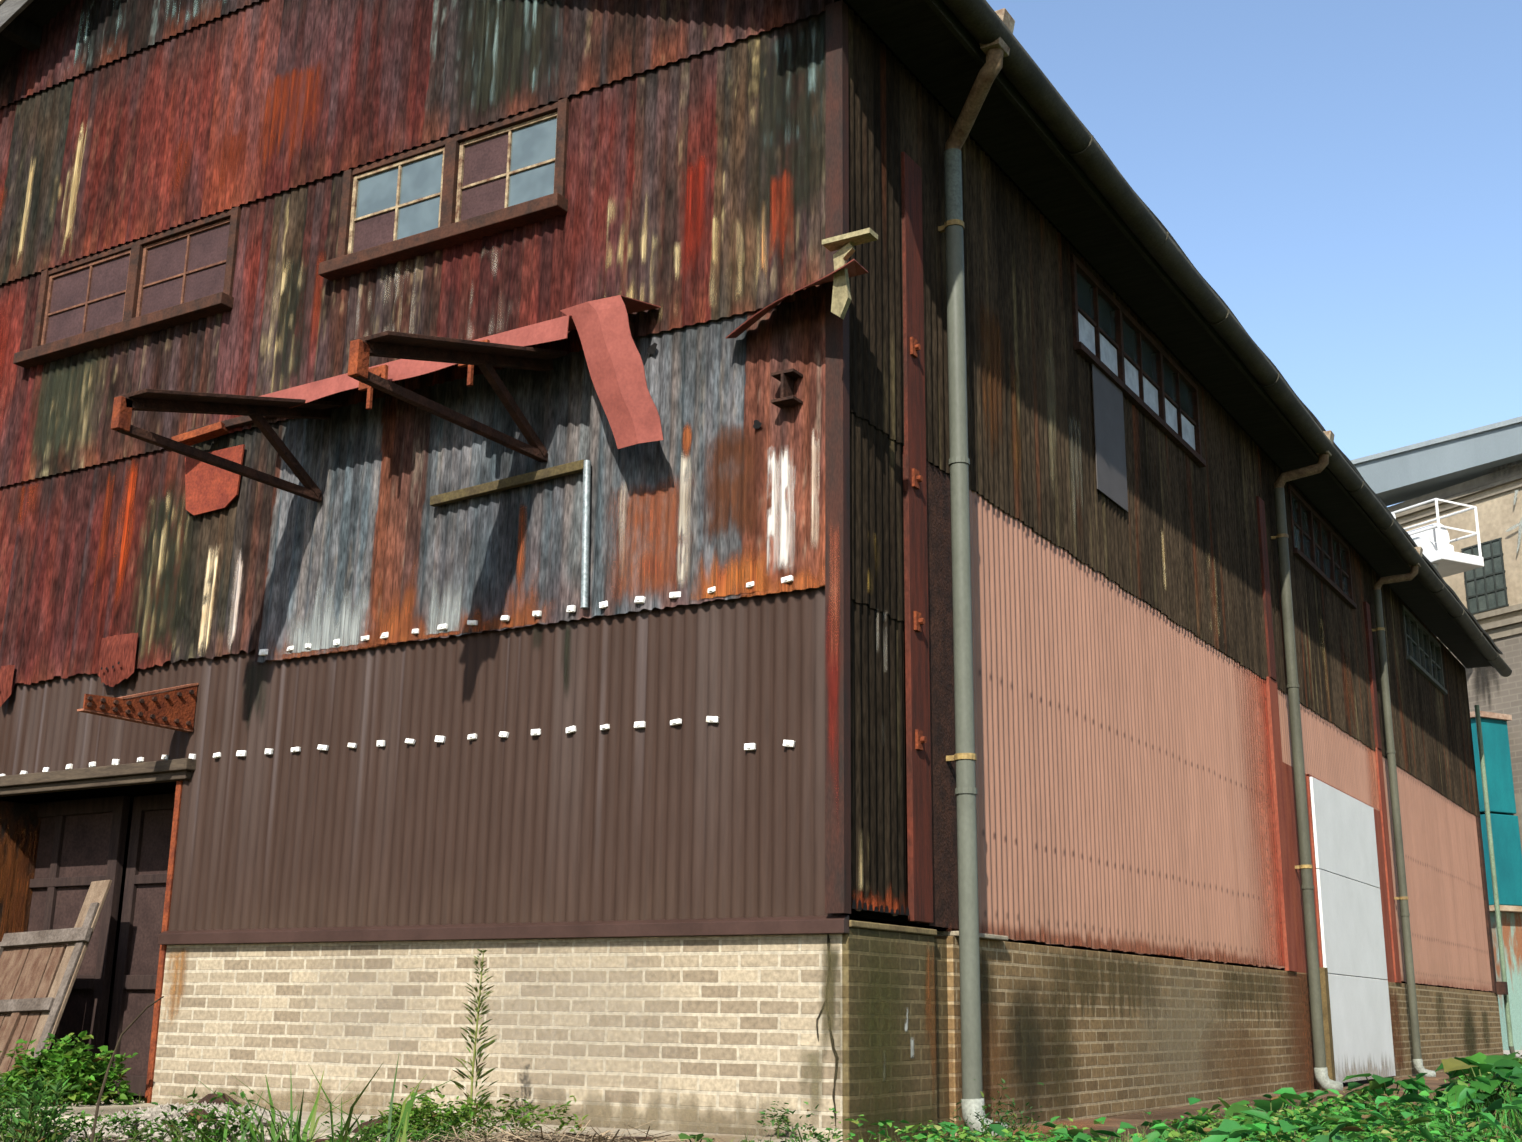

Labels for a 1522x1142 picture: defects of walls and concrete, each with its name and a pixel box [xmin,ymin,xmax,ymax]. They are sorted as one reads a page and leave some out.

corrosion [263,68,318,154]
corrosion [94,466,136,586]
corrosion [283,507,537,659]
corrosion [618,486,680,592]
corrosion [708,428,754,535]
corrosion [701,533,838,758]
corrosion [853,891,899,913]
water stain [980,954,993,1043]
corrosion [981,1033,1005,1106]
water stain [1013,954,1142,1116]
corrosion [1010,929,1255,965]
corrosion [1289,972,1321,1092]